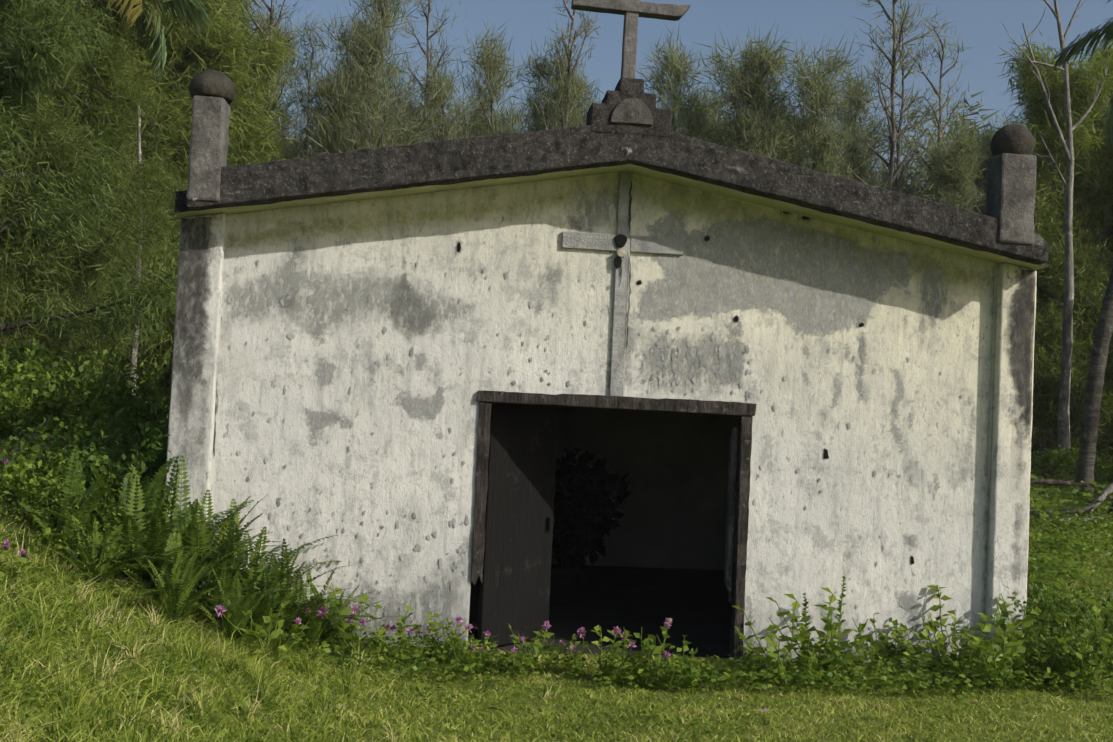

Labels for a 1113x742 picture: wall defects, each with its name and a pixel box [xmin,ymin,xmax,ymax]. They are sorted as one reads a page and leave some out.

damp [170,215,212,467]
damp [228,247,470,338]
damp [646,335,744,389]
damp [1007,267,1036,444]